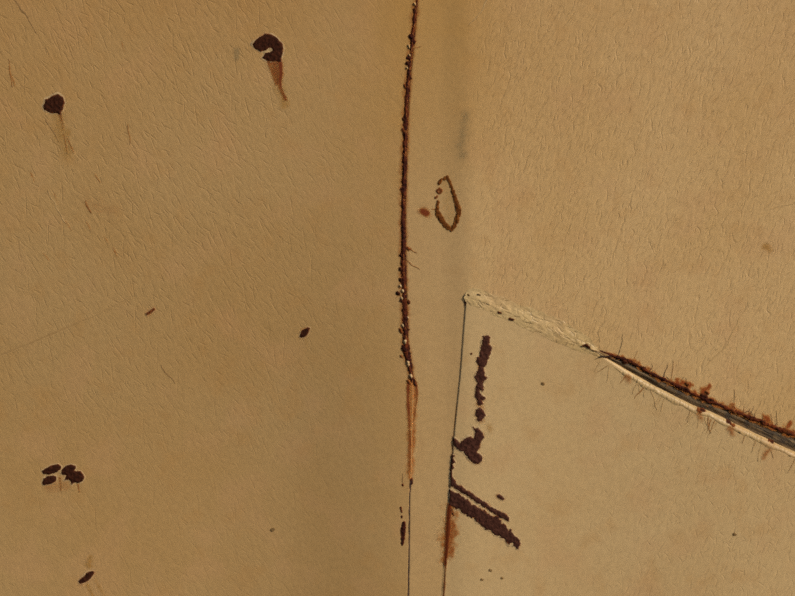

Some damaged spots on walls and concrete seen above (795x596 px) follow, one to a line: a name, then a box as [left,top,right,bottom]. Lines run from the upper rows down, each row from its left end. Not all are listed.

rust [400,0,418,478]
rust [420,175,462,232]
rust [582,334,795,470]
rust [441,504,459,596]